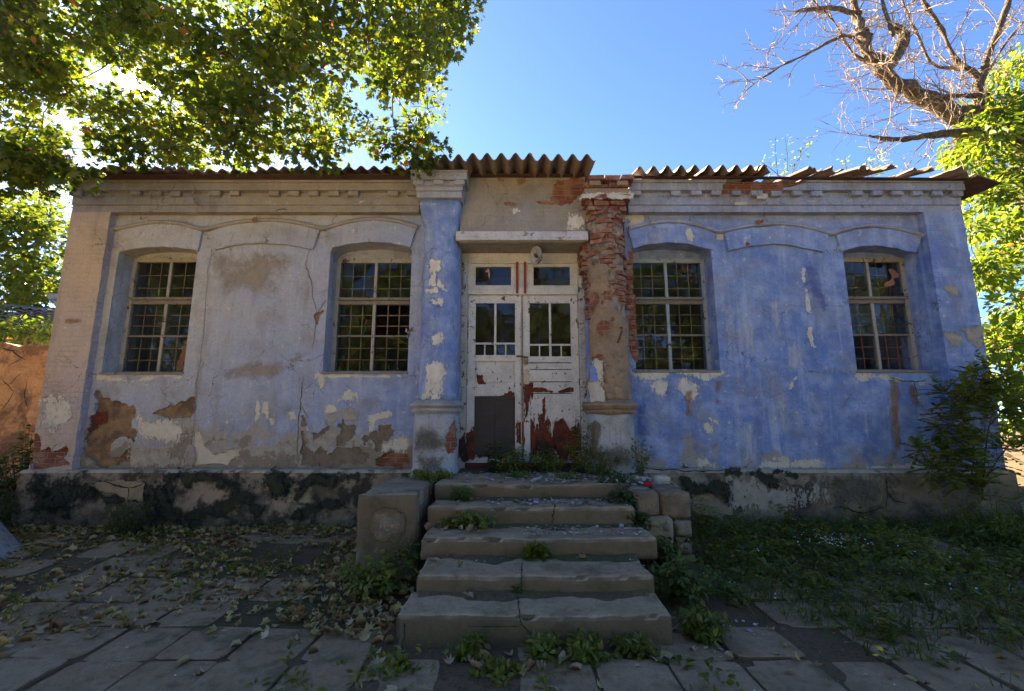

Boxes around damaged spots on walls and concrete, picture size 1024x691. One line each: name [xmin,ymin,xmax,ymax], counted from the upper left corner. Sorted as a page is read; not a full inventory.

flaking render [536,178,585,231]
flaking render [625,215,644,226]
crack [305,252,326,349]
peeling [425,257,448,307]
peeling [32,393,75,469]
flaking render [82,374,243,468]
flaking render [278,372,411,468]
water stain [23,466,360,524]
crack [468,564,532,634]